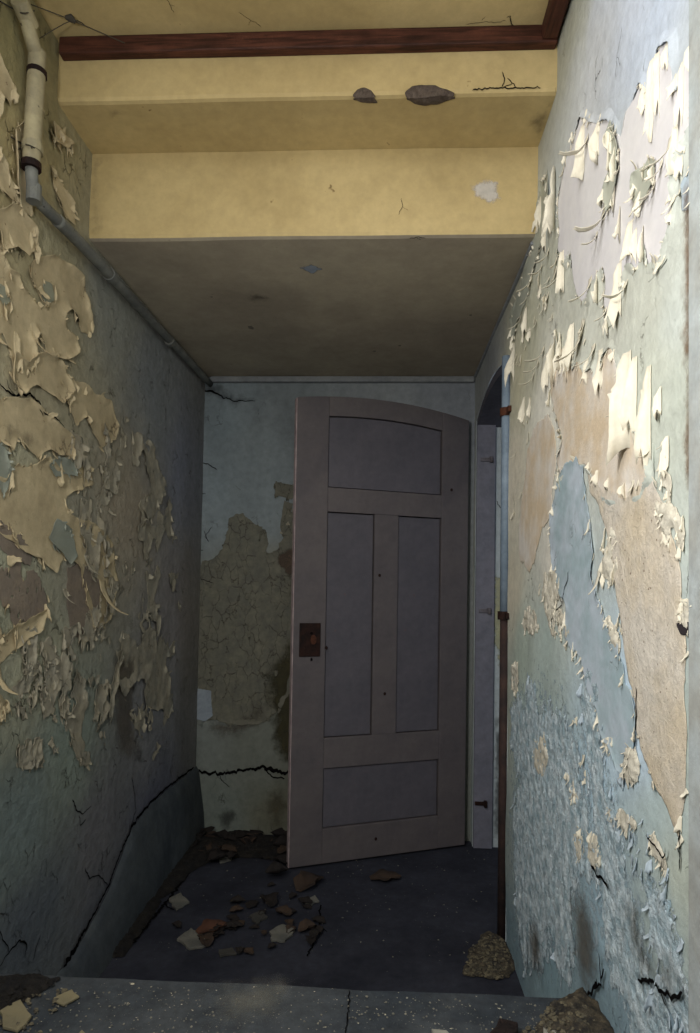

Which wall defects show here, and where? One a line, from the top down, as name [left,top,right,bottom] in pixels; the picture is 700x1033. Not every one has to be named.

peeling [0,121,181,773]
peeling [504,27,691,885]
peeling [197,481,293,728]
leakage [271,646,290,761]
crack [0,931,41,966]
crack [64,765,288,967]
crack [587,957,604,996]
crack [638,977,682,1006]